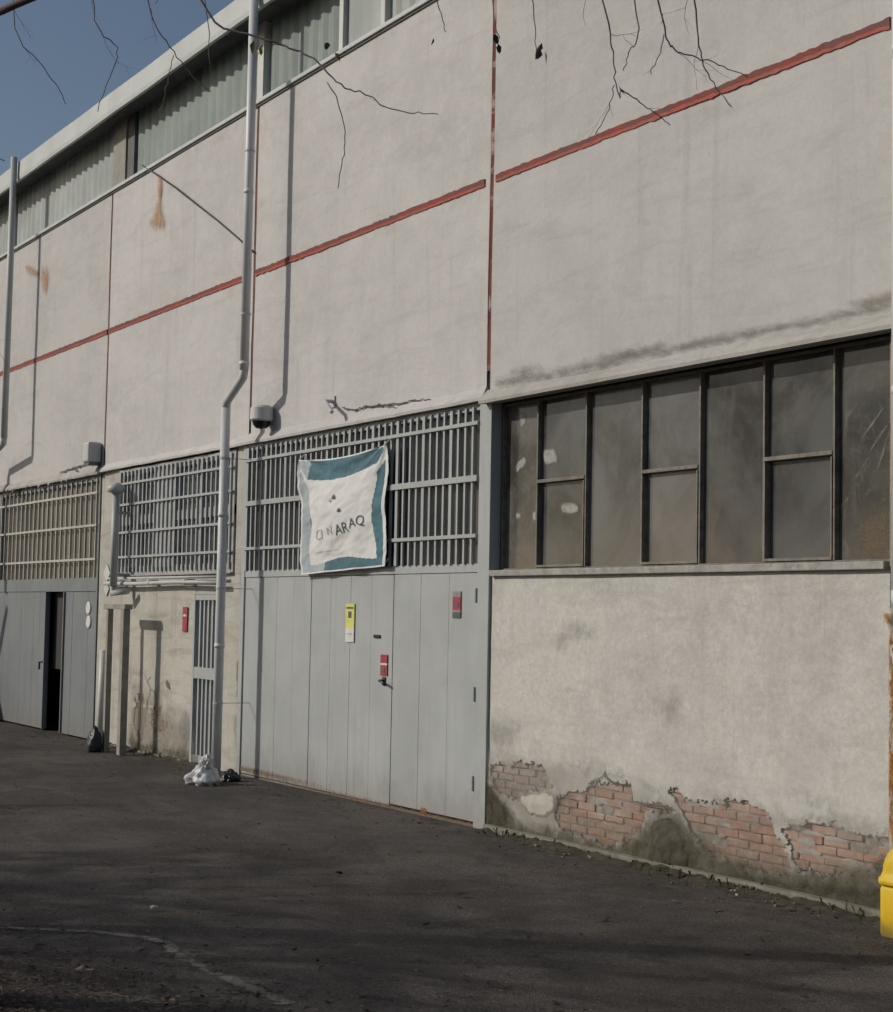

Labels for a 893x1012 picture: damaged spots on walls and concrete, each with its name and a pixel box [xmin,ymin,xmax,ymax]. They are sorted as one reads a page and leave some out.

corrosion [153,178,163,226]
corrosion [884,614,893,840]
leakage [486,786,884,909]
flaking render [488,761,890,879]